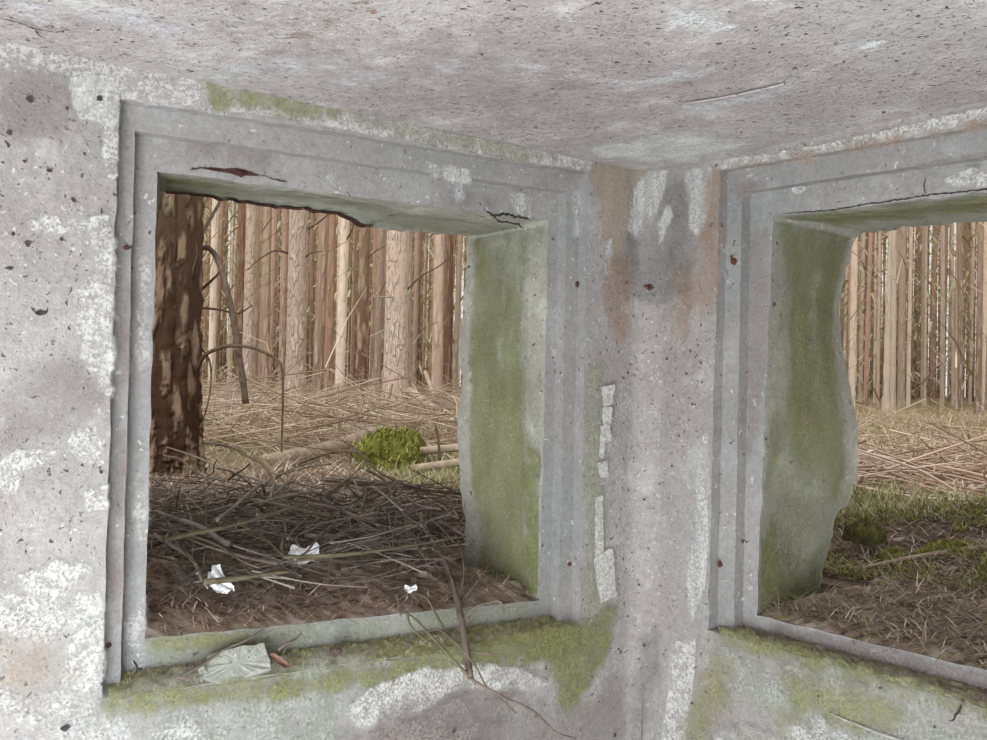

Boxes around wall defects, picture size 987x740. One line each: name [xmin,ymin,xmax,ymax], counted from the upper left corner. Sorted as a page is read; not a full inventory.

crack [483,208,529,228]
crack [787,176,987,214]
damp [776,625,987,690]
damp [719,646,986,740]